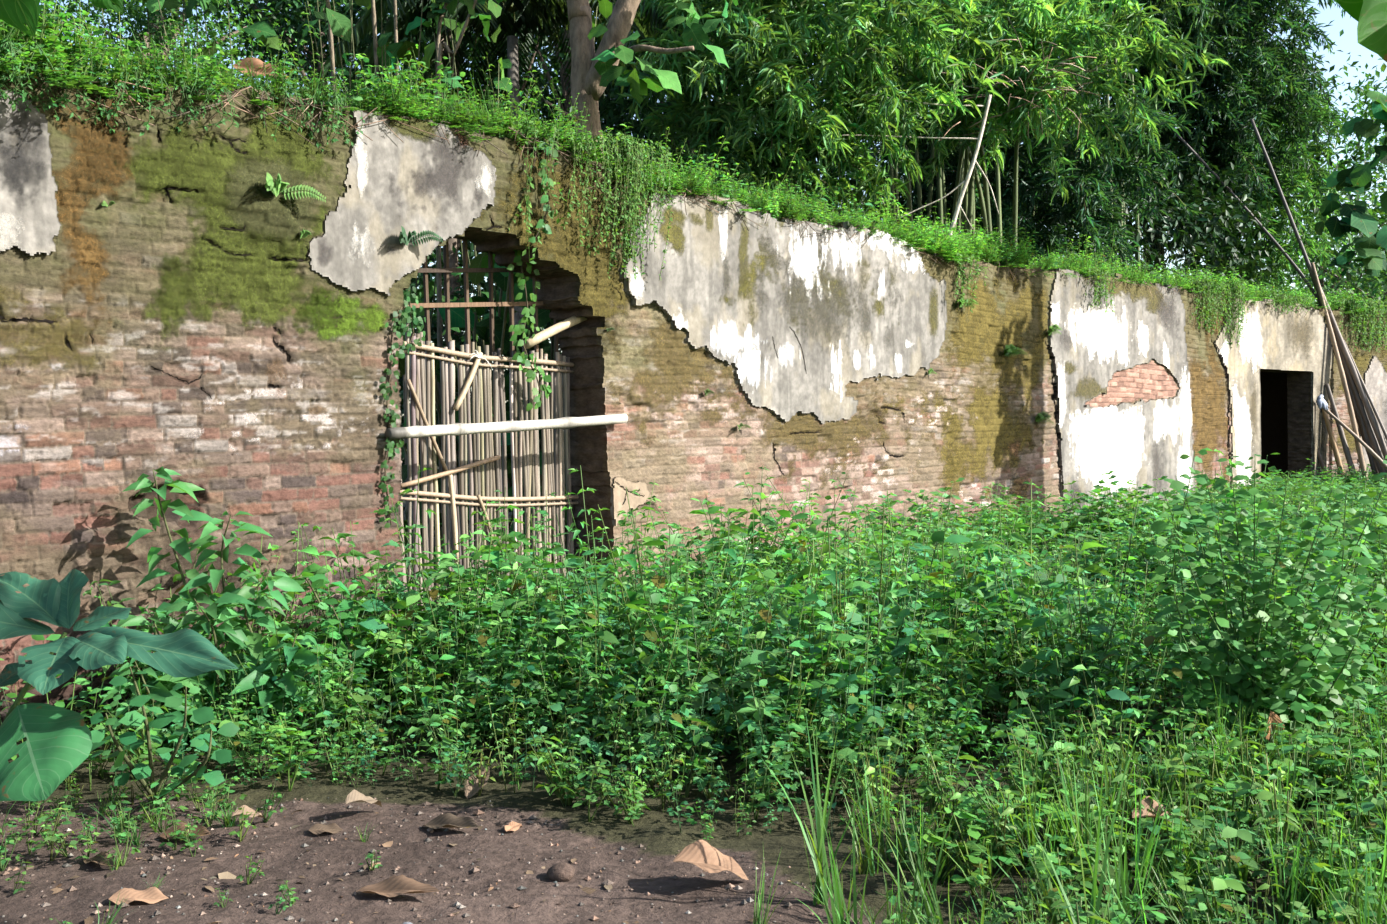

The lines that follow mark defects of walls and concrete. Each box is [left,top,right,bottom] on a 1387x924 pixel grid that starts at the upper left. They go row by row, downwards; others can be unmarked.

damp [0,113,44,195]
flaking render [0,89,61,256]
damp [319,241,331,264]
damp [355,130,367,191]
flaking render [306,109,496,296]
damp [414,142,463,198]
damp [476,167,491,198]
flaking render [620,184,947,424]
damp [929,291,938,334]
flaking render [1047,268,1196,515]
flaking render [1213,299,1334,489]
flaking render [1357,356,1387,478]